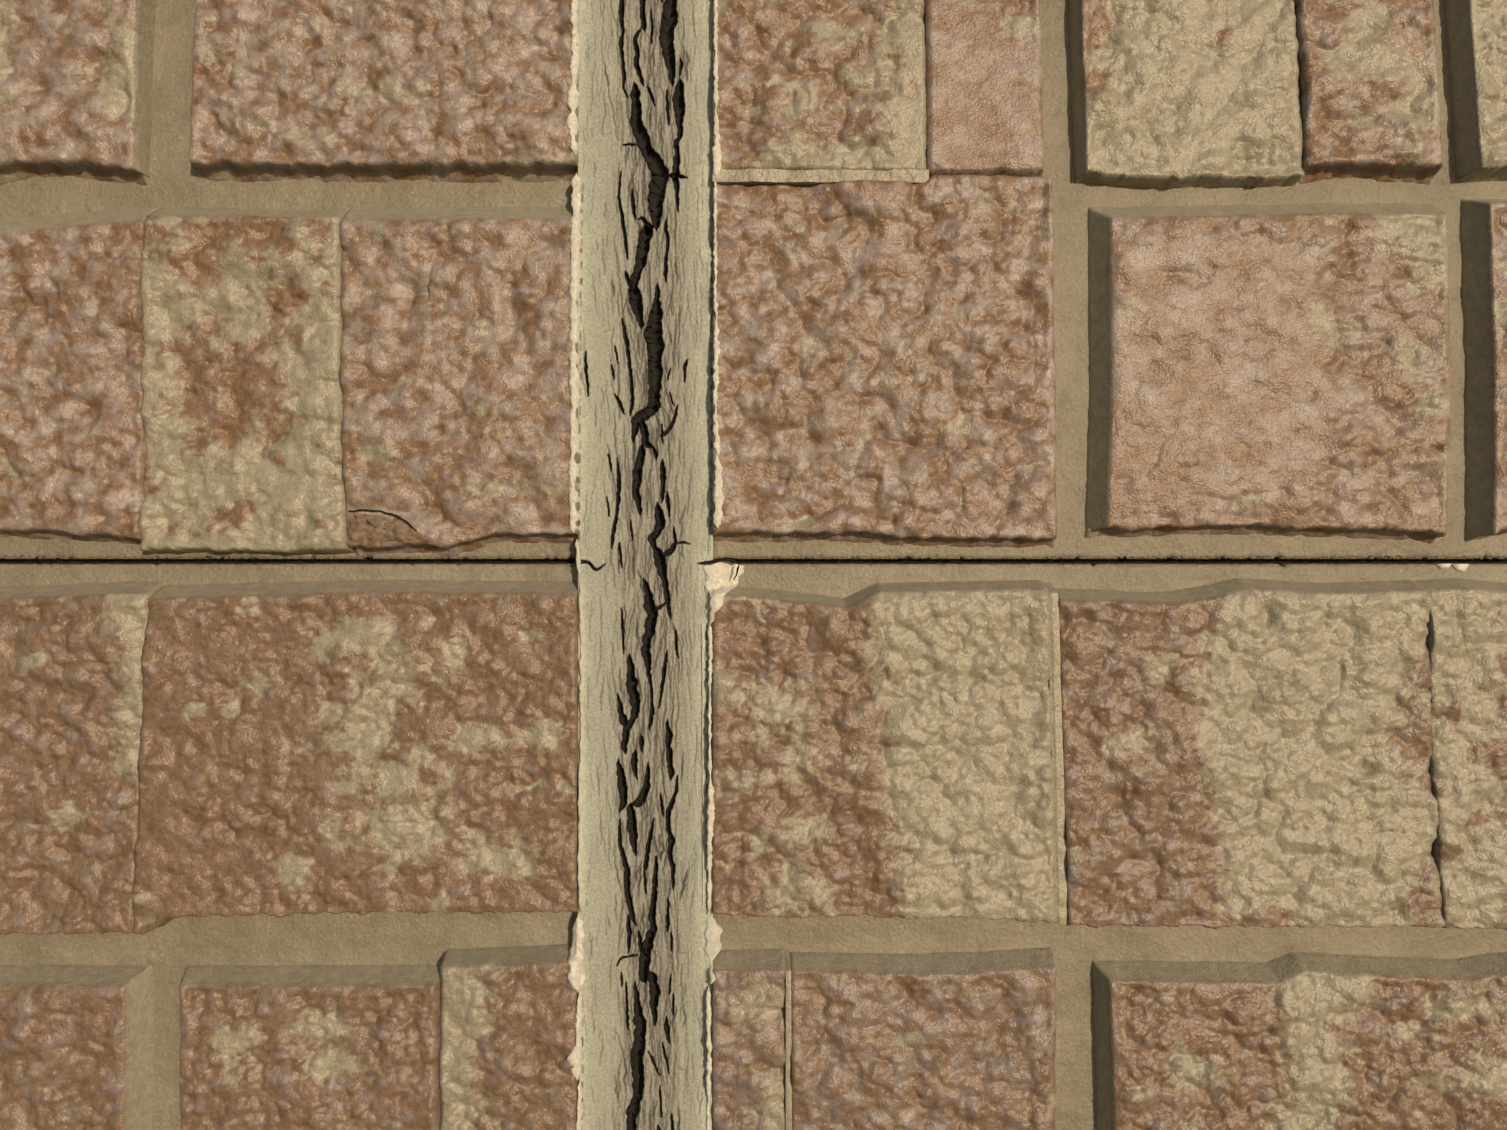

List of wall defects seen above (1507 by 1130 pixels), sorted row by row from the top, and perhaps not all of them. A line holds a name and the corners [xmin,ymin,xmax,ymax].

crack [574,0,742,1130]
peeling [701,561,745,1130]